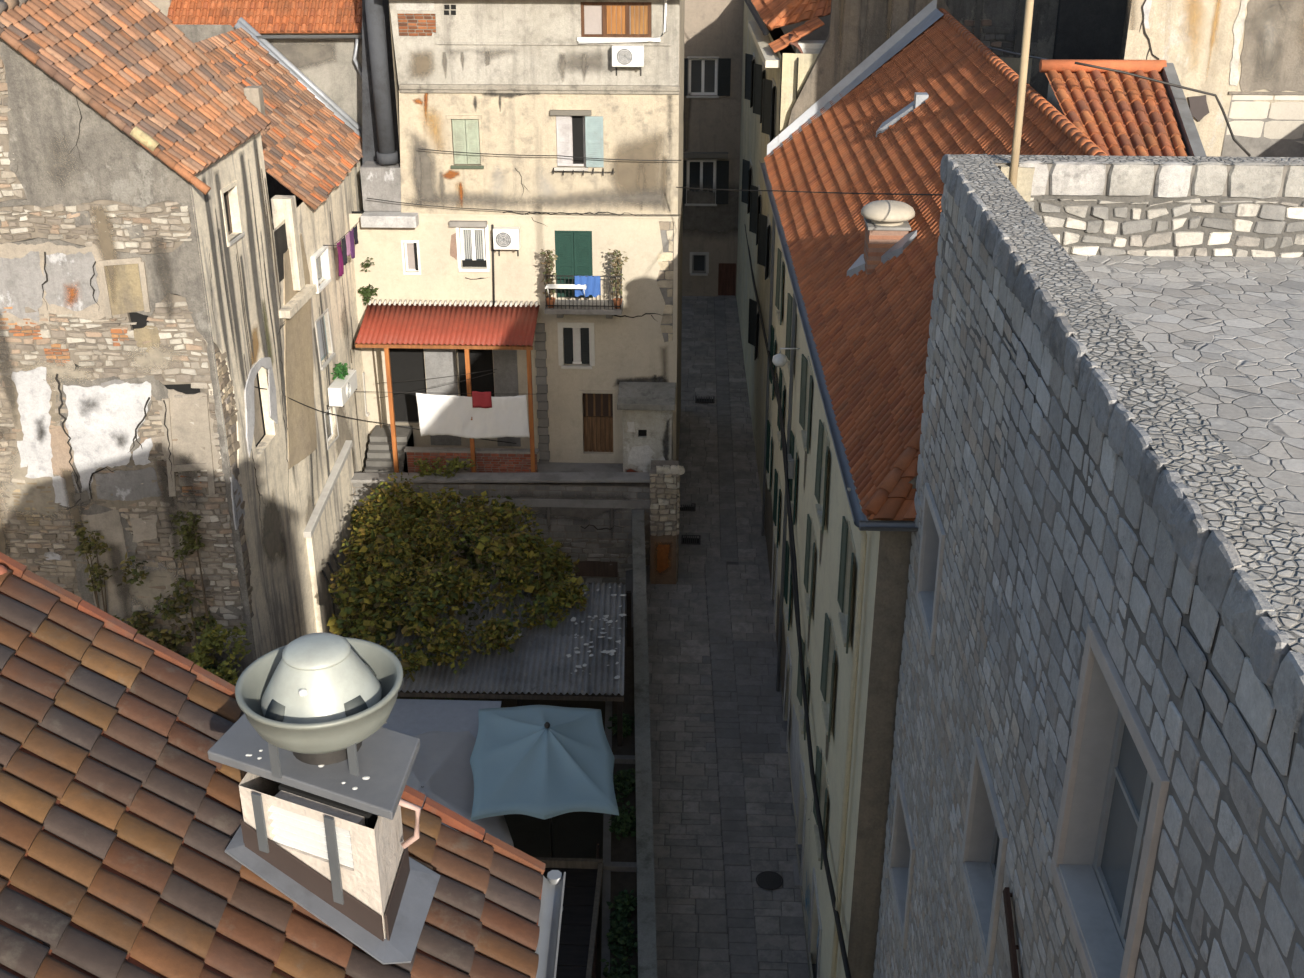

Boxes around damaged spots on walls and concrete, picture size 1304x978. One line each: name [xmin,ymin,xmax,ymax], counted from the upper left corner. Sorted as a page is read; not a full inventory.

crack [1139,0,1159,60]
flaking render [0,55,317,658]